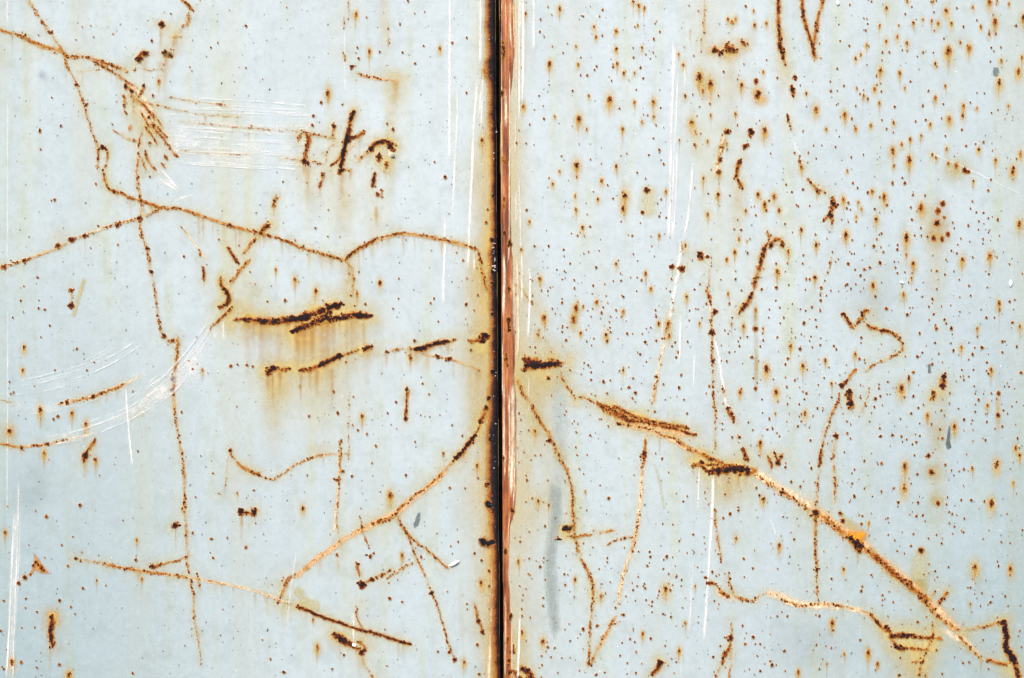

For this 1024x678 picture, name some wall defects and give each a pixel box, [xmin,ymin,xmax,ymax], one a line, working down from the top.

rust [134,11,189,84]
rust [225,288,375,387]
rust [467,0,558,678]
rust [605,402,678,438]
rust [688,450,757,479]
rust [555,524,615,540]
rust [838,511,870,541]
rust [331,606,367,656]
rust [869,612,943,678]